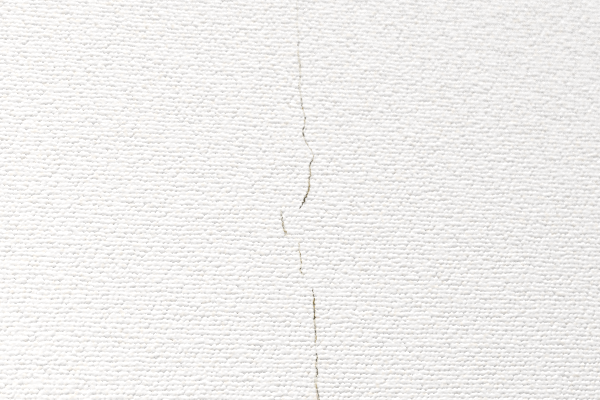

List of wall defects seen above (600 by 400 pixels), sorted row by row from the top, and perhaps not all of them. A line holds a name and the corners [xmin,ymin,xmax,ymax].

crack [298,85,314,209]
crack [312,290,320,400]